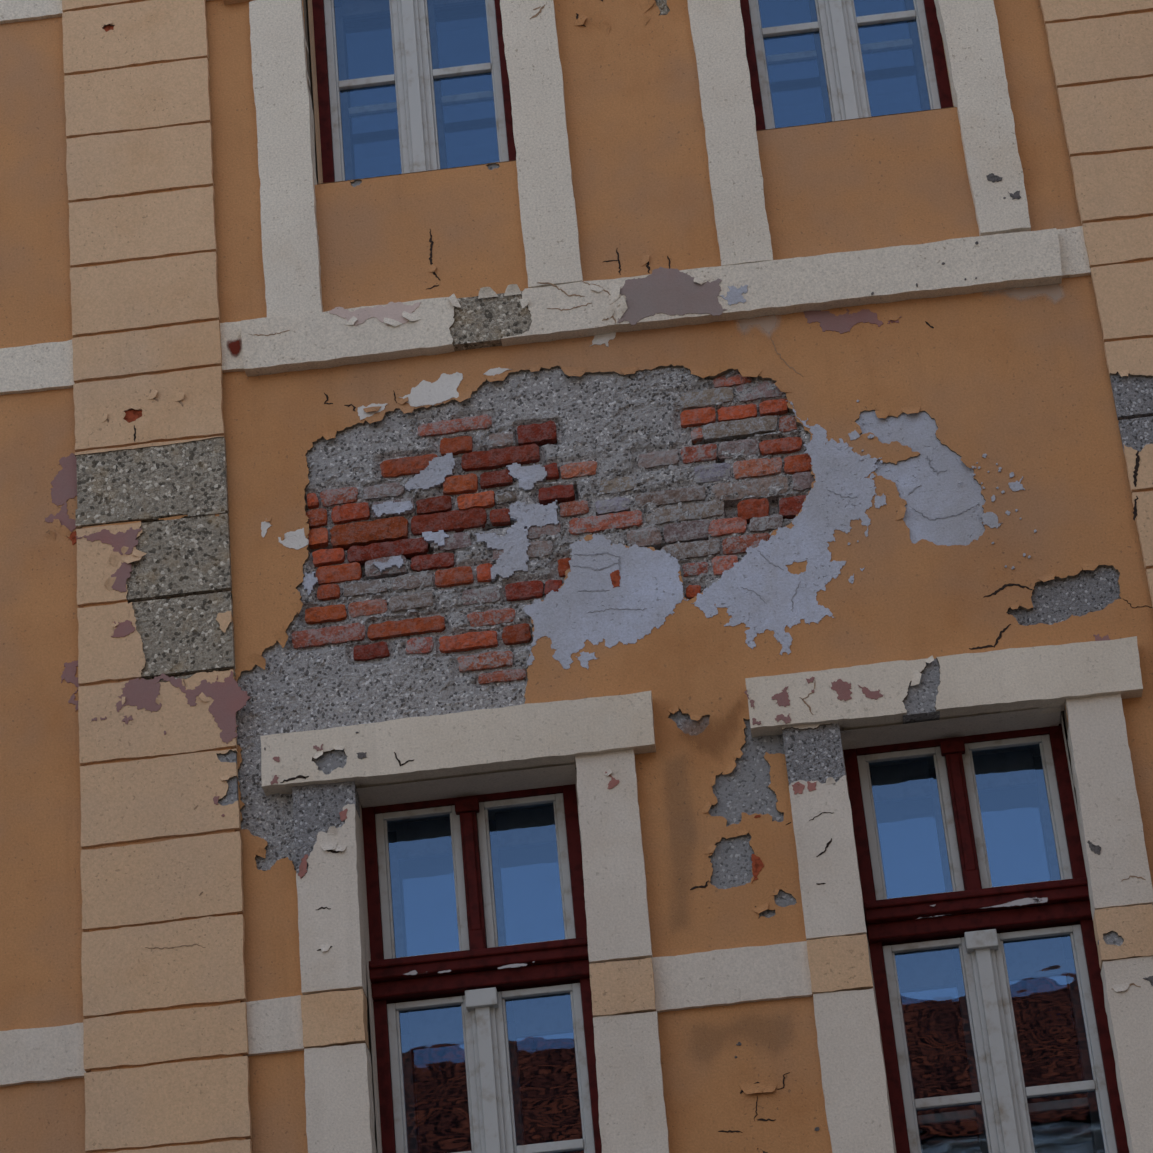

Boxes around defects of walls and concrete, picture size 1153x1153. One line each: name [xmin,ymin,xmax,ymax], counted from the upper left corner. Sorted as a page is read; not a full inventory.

crack [427,229,440,289]
spalling [448,284,532,351]
peeling [803,309,901,334]
spalling [1110,369,1153,452]
crack [1132,451,1140,520]
crack [983,583,1032,598]
spalling [1007,563,1120,626]
spalling [43,364,1025,889]
crack [969,624,1011,650]
crack [718,1072,790,1133]